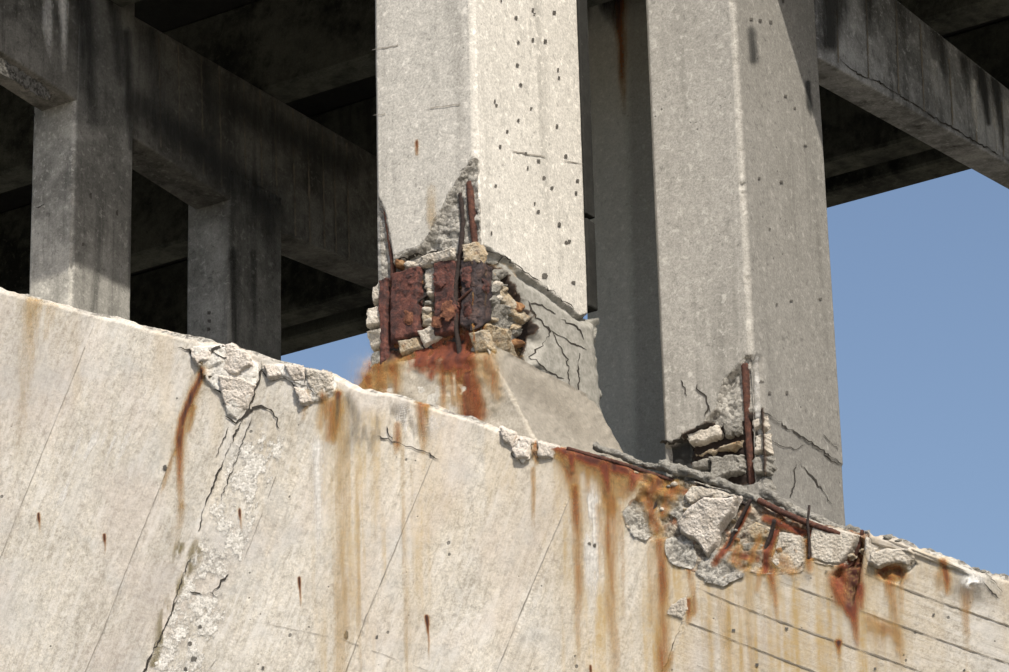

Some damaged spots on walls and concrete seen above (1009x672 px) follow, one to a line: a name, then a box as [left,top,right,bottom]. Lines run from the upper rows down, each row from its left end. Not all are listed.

rust [175,367,204,484]
peeling [152,427,283,672]
crack [380,427,437,459]
rust [359,324,497,420]
spalling [382,159,531,358]
crack [486,250,585,390]
rust [552,447,688,672]
spalling [566,441,915,586]
spalling [714,361,771,485]
rust [713,507,812,604]
crack [764,413,840,504]
rust [831,543,864,631]